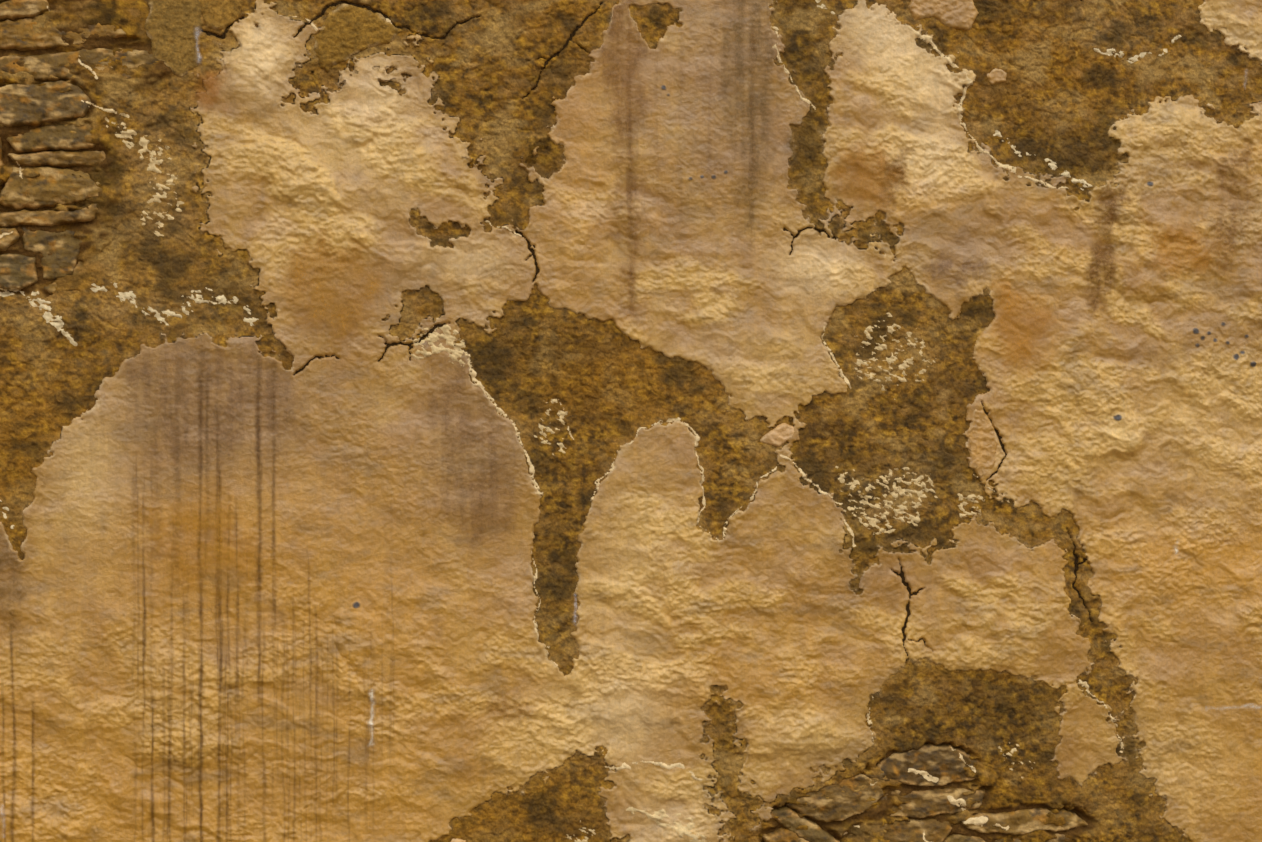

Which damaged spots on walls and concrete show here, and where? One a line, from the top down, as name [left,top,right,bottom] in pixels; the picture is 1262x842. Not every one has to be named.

flaking render [0,0,683,560]
flaking render [429,0,1262,842]
crack [891,558,926,661]